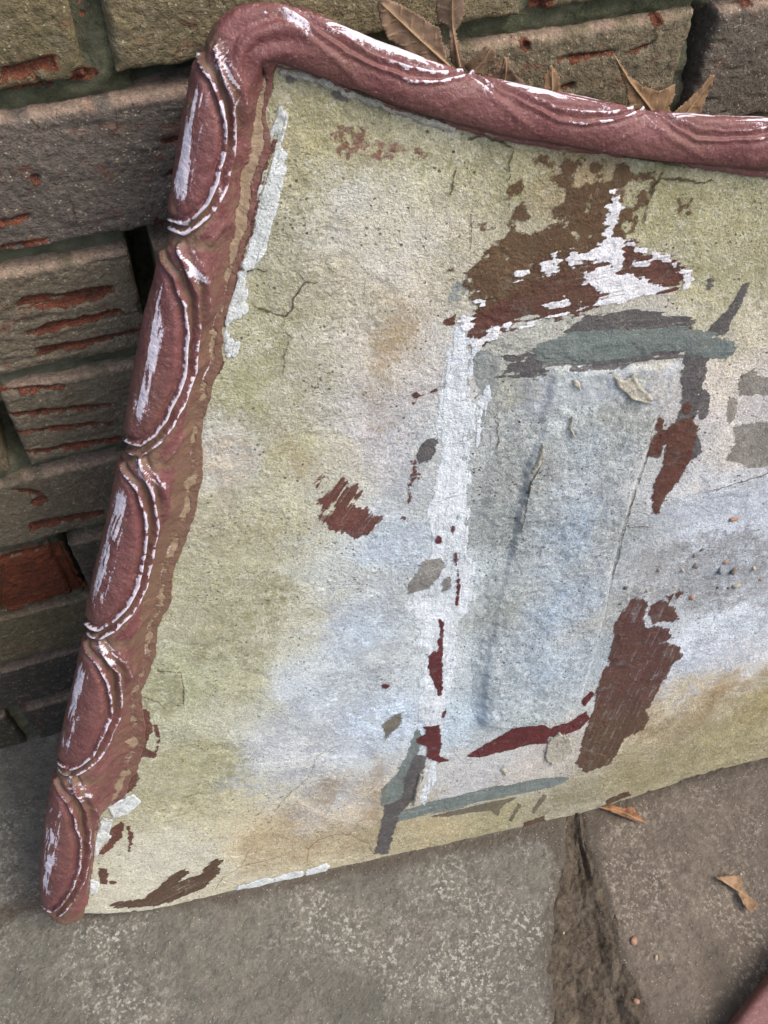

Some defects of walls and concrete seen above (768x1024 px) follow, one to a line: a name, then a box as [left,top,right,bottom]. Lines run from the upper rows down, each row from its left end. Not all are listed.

peeling [223,106,289,359]
crack [255,270,319,373]